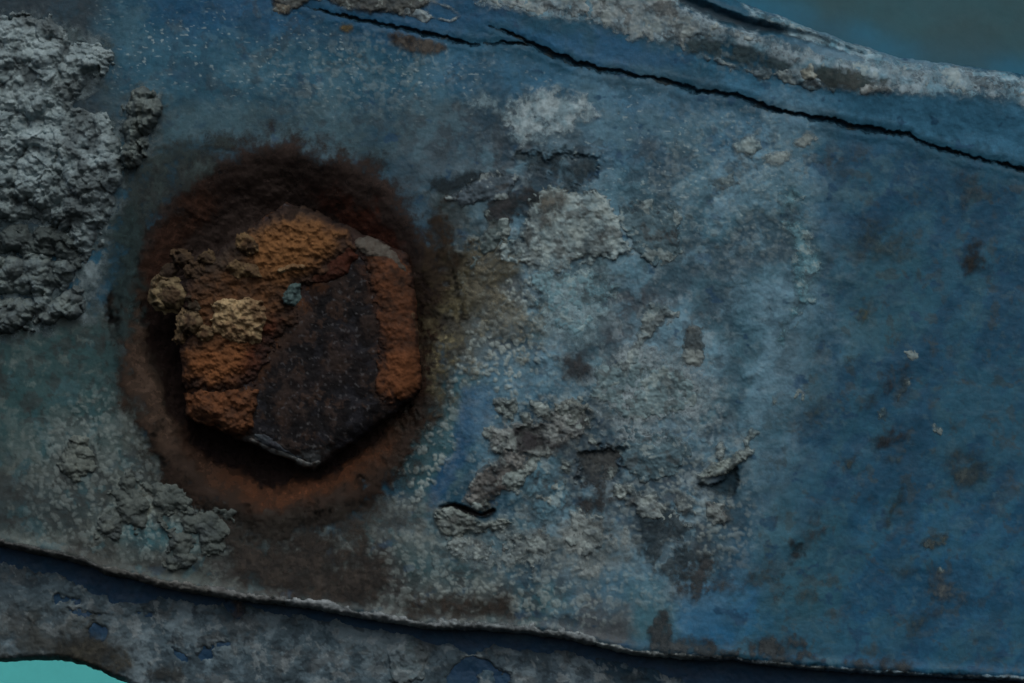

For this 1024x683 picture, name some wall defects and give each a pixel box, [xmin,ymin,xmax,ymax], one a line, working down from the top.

crack [307,6,1024,173]
peeling [480,0,1024,105]
rust [111,133,465,605]
peeling [430,142,725,514]
spalling [440,503,496,517]
spalling [631,429,760,600]
rust [406,592,513,619]